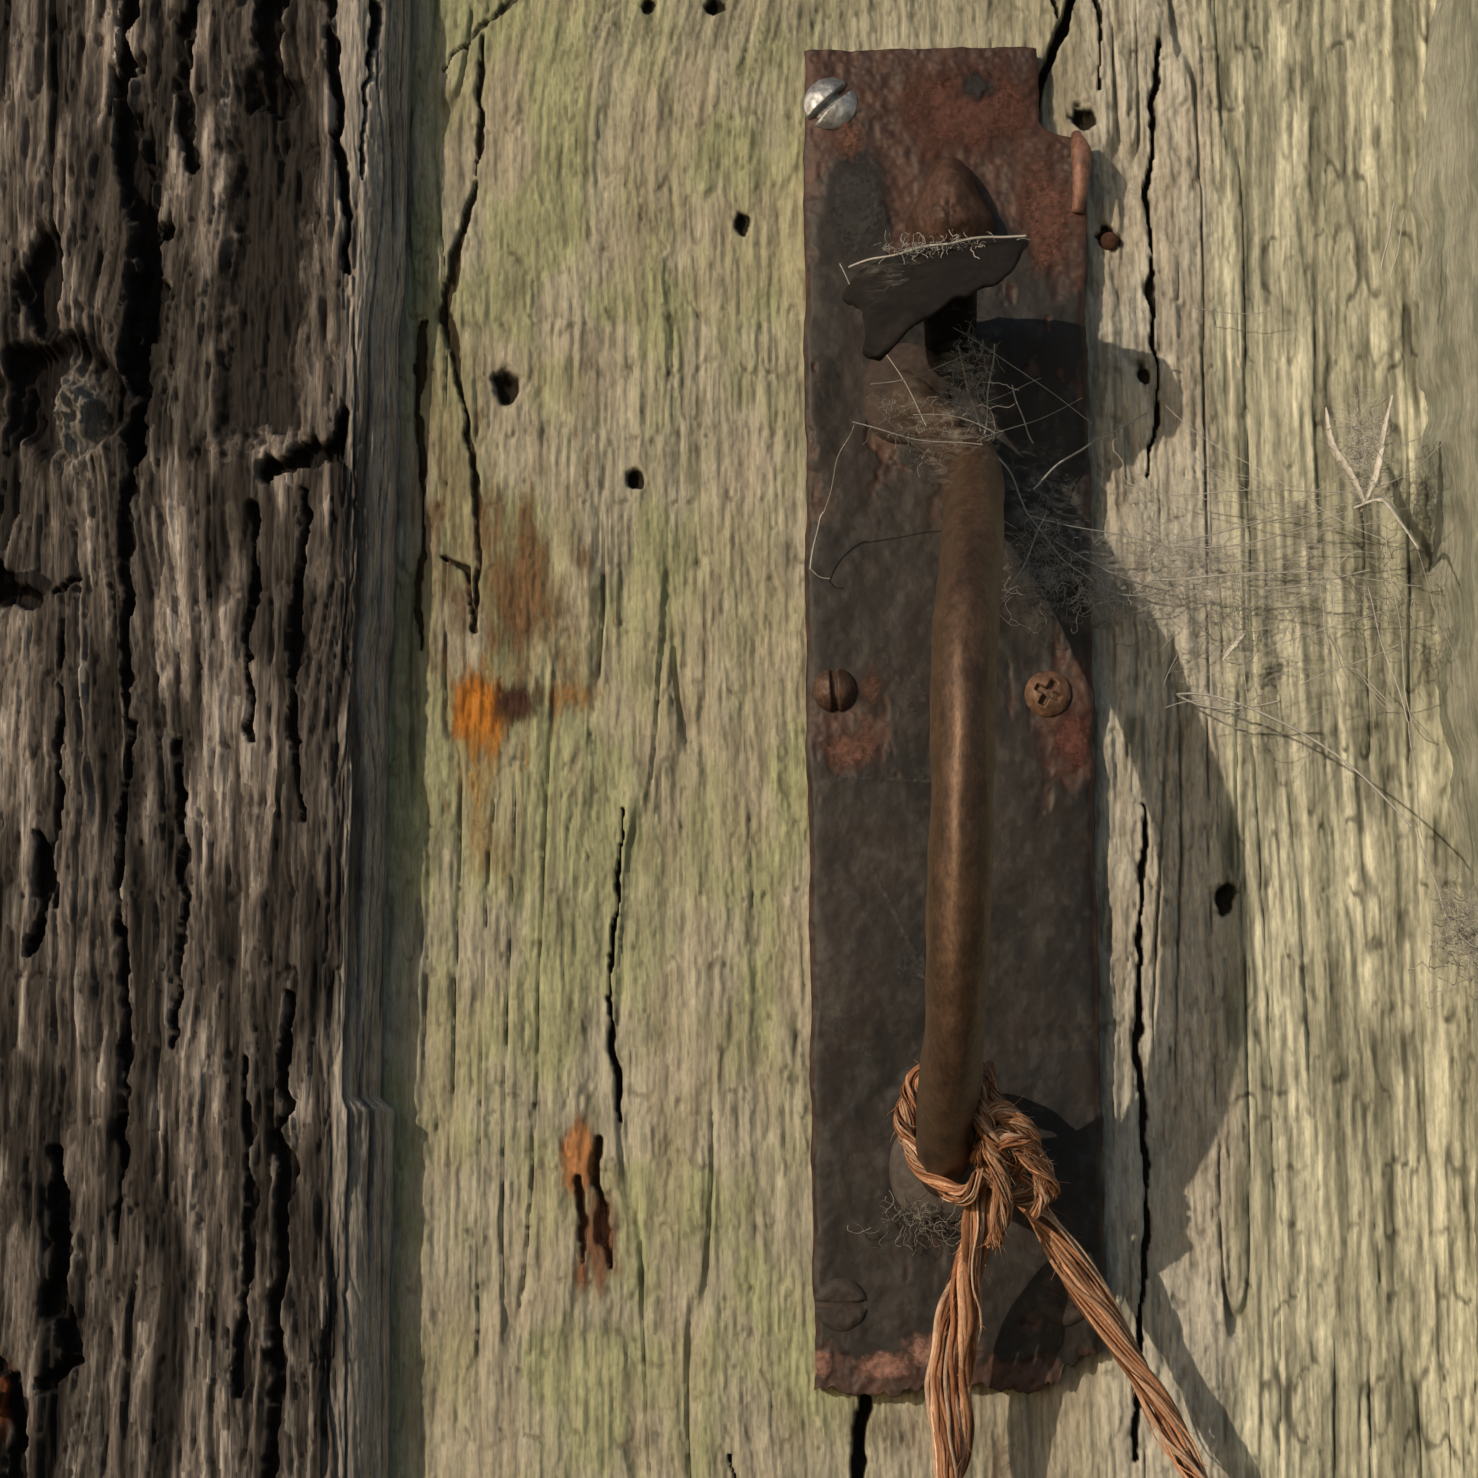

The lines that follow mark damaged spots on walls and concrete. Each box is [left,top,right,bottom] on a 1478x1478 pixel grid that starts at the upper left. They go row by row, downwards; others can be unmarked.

crack [1038,0,1102,107]
crack [413,36,486,651]
corrosion [899,62,1085,269]
crack [1142,41,1162,478]
corrosion [446,487,590,856]
corrosion [825,666,880,769]
corrosion [1055,713,1090,769]
crack [607,808,625,1122]
crack [1132,803,1151,1352]
corrosion [560,1116,616,1295]
crack [851,1394,873,1478]
corrosion [860,1335,932,1379]